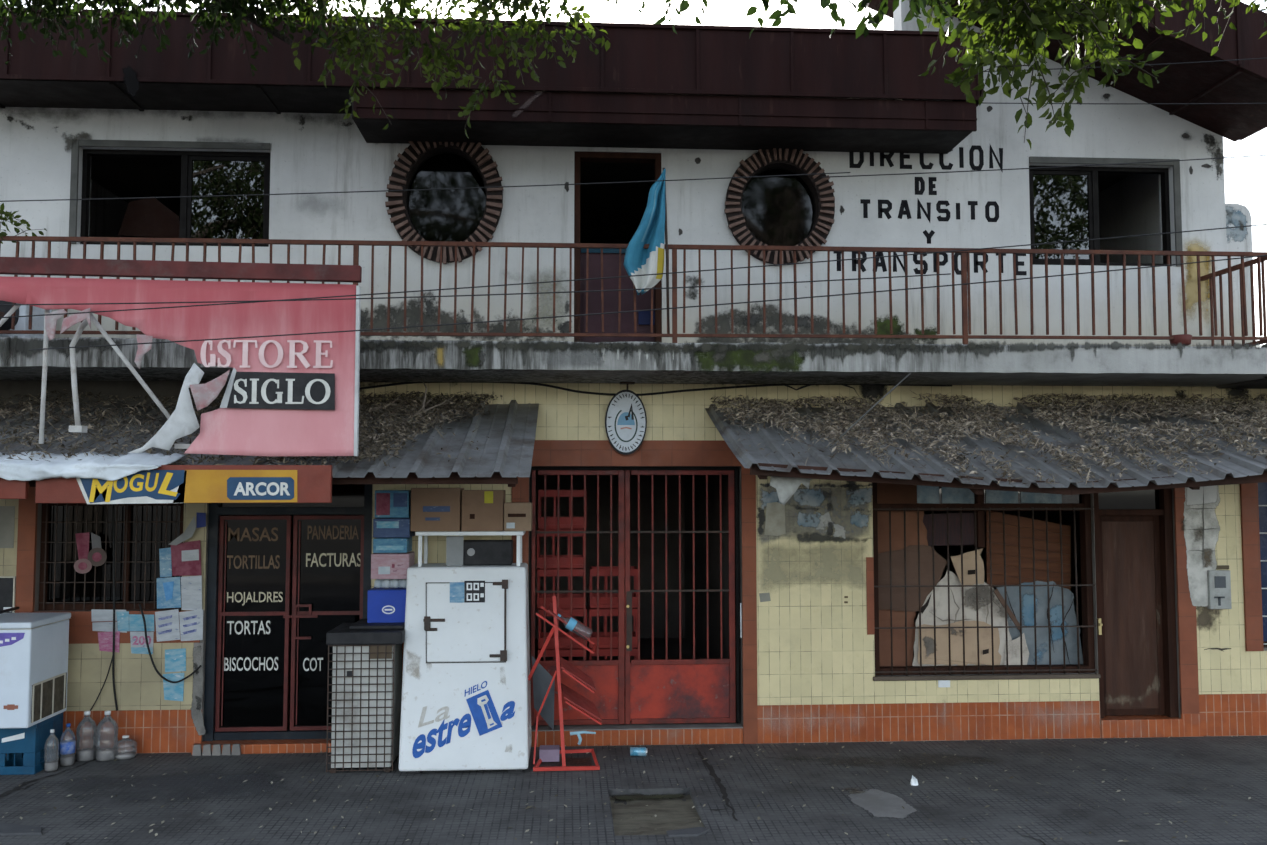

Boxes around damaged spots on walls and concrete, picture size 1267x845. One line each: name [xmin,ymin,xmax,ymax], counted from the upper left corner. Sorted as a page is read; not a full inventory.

water stain [360,277,1267,366]
rust [1185,243,1210,311]
peeling [757,483,872,542]
peeling [1182,485,1220,607]